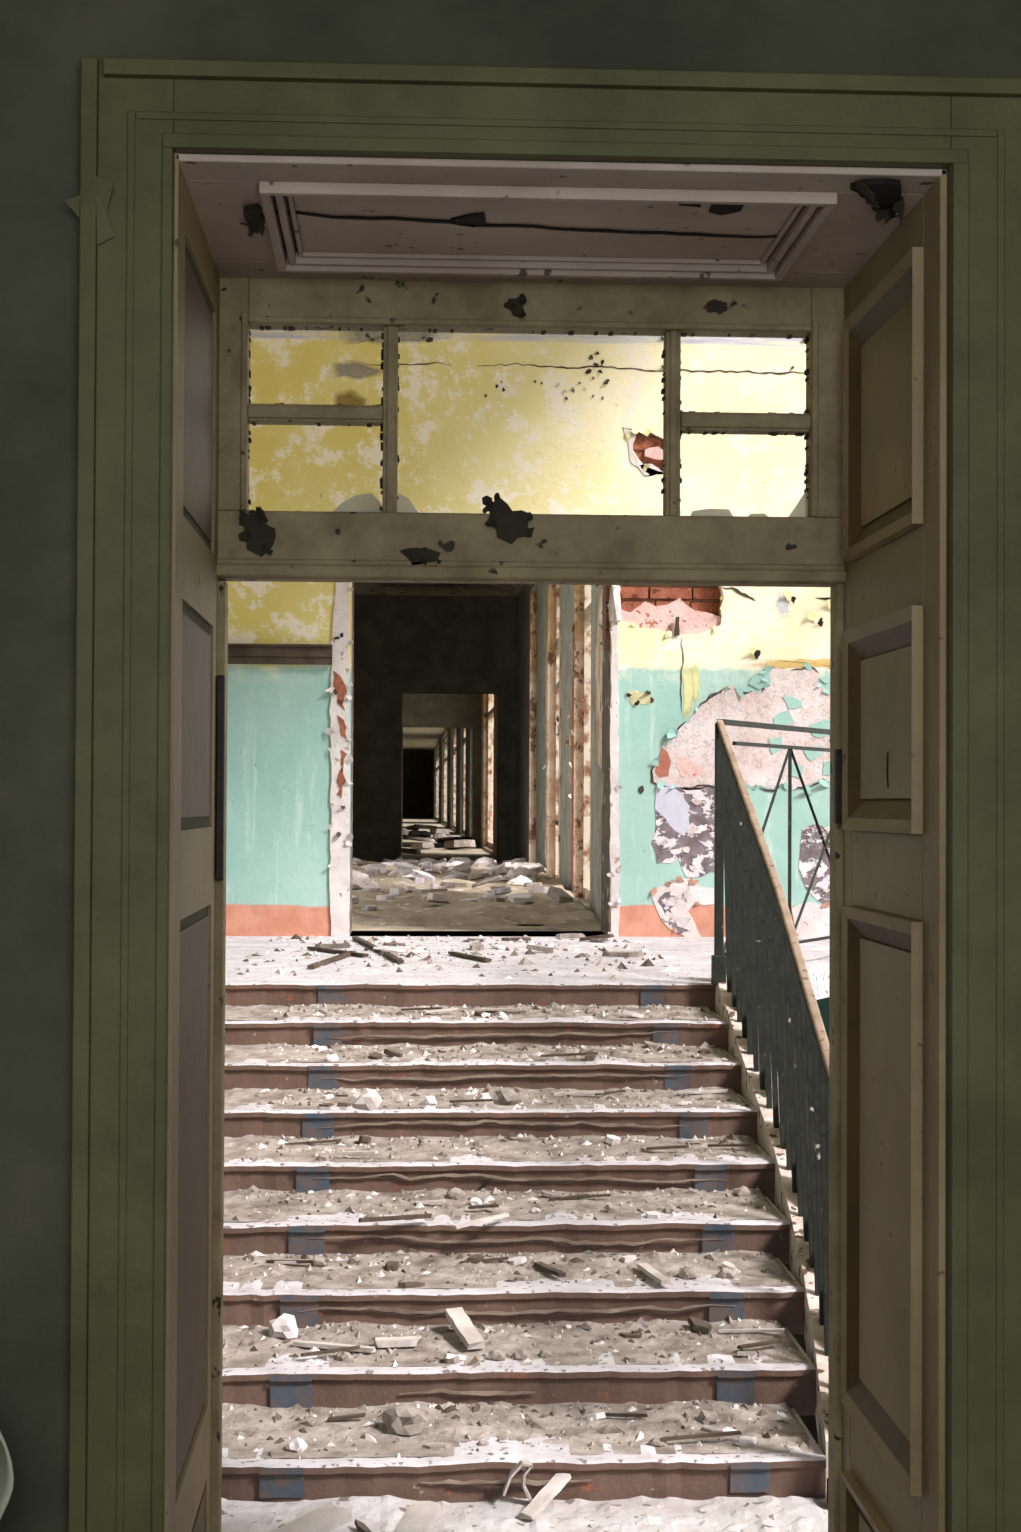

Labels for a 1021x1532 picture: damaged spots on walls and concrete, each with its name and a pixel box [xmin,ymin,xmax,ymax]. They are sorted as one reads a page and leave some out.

crack [276,210,777,239]
peeling [850,178,905,228]
crack [369,362,804,375]
flaking render [623,427,663,476]
flaking render [325,582,353,936]
peeling [594,585,830,937]